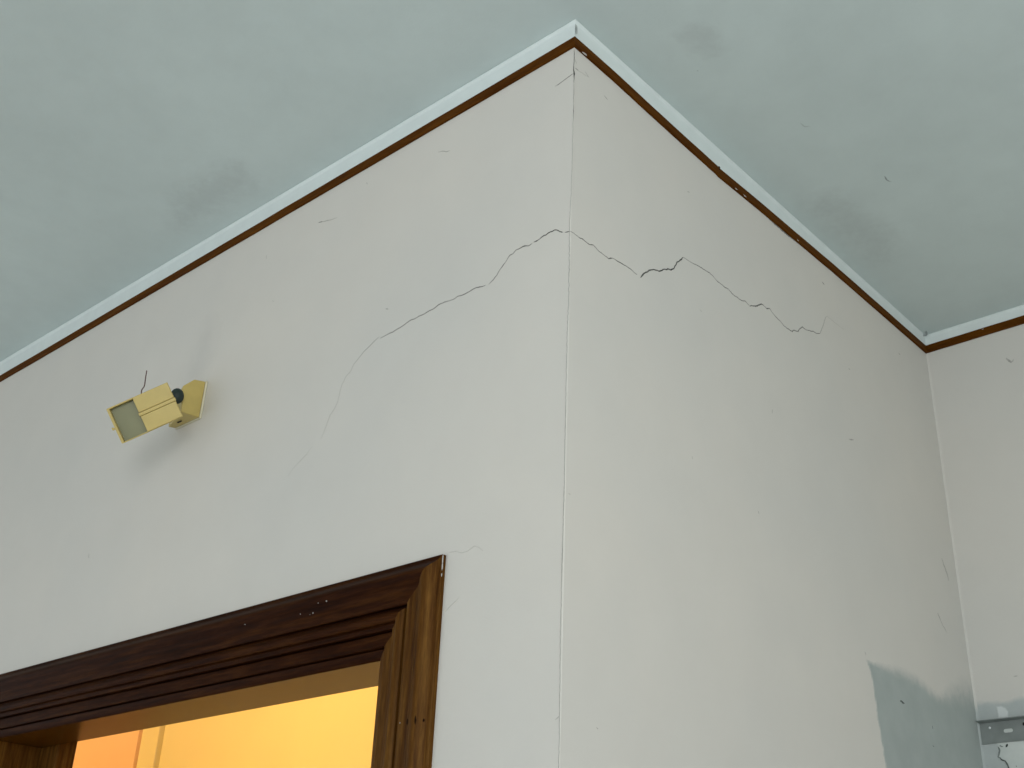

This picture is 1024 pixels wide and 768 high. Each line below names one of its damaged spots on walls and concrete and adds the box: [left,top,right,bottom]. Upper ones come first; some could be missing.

crack [288,24,843,768]